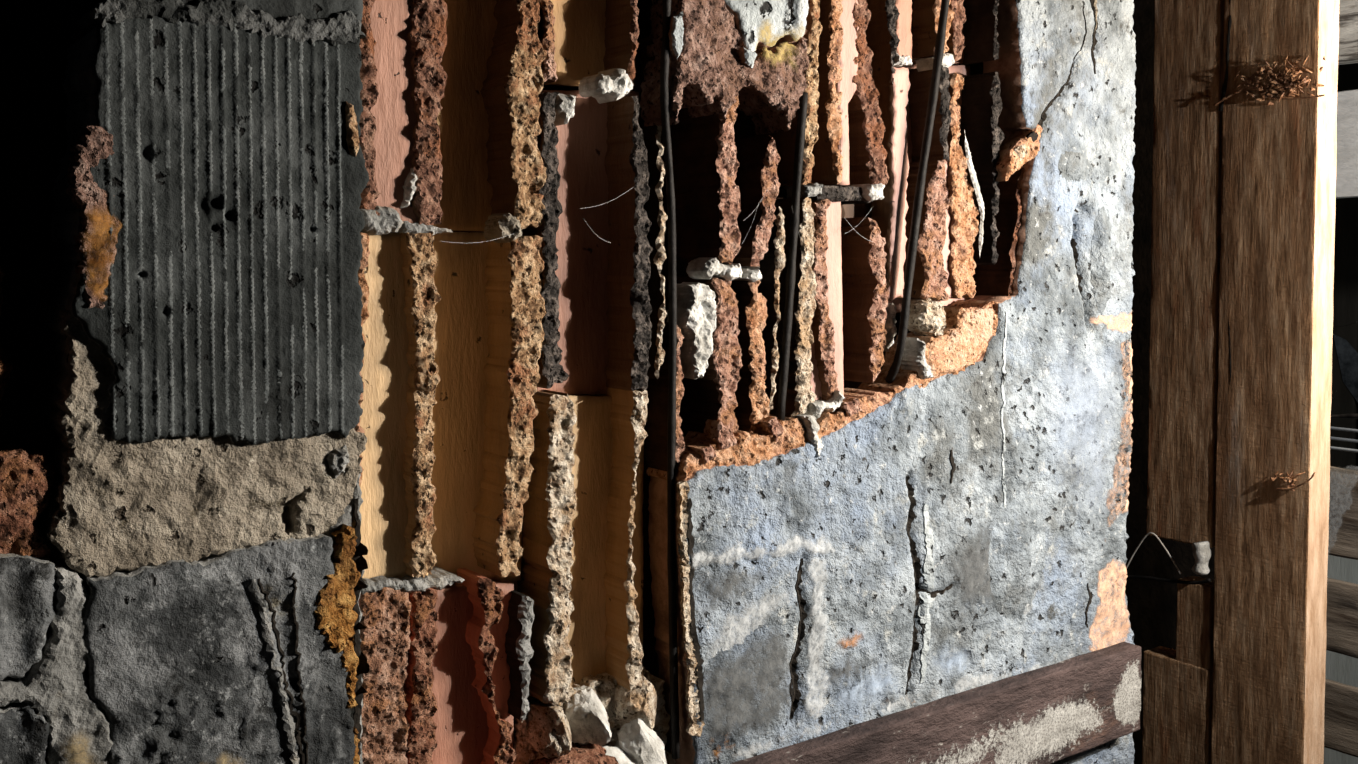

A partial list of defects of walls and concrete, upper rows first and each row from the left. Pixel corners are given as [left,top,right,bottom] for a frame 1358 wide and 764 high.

spalling [639,0,809,135]
crack [789,0,797,24]
crack [1026,0,1098,142]
spalling [646,124,1043,483]
peeling [1070,235,1133,524]
corrosion [314,524,361,709]
crack [789,558,807,719]
crack [905,475,953,695]
peeling [1089,560,1130,651]